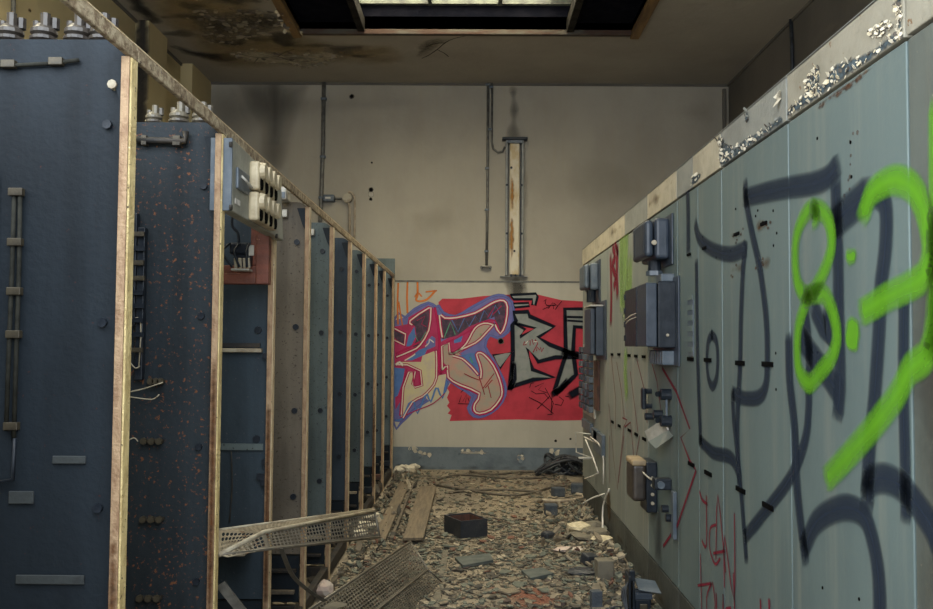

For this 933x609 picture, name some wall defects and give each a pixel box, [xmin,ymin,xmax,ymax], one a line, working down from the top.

peeling [186,0,303,46]
leakage [165,0,372,61]
peeling [713,0,903,164]